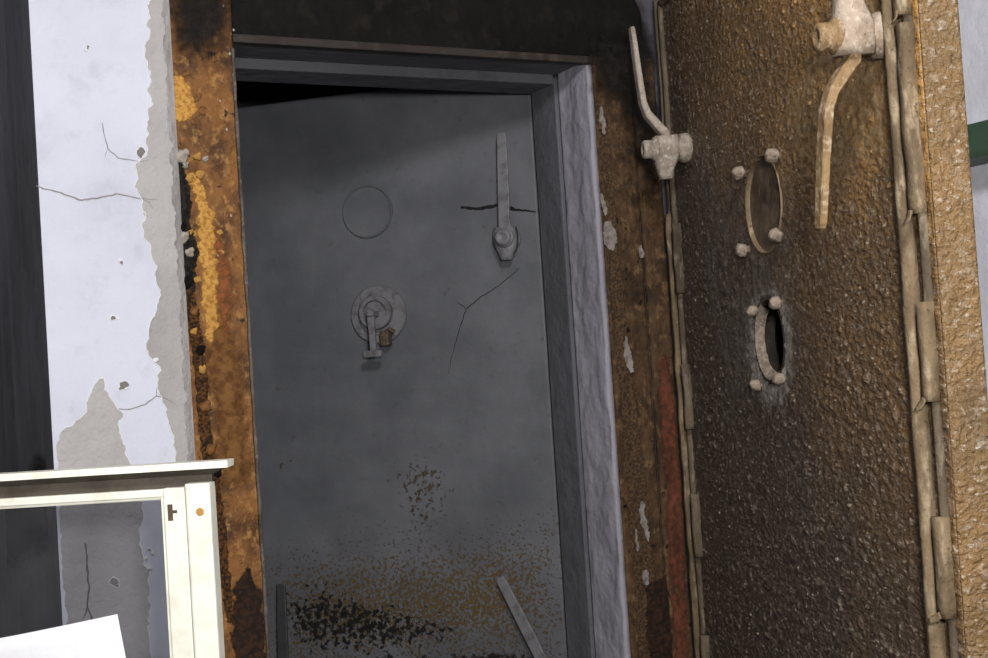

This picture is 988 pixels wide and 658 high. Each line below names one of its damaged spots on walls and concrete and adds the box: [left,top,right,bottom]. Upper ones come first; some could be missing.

crack [37,186,157,209]
crack [102,122,146,162]
peeling [134,0,225,462]
peeling [56,377,132,469]
peeling [59,501,154,658]
rust [202,224,251,486]
spalling [214,470,270,658]
rust [264,458,567,658]
rust [659,354,688,658]